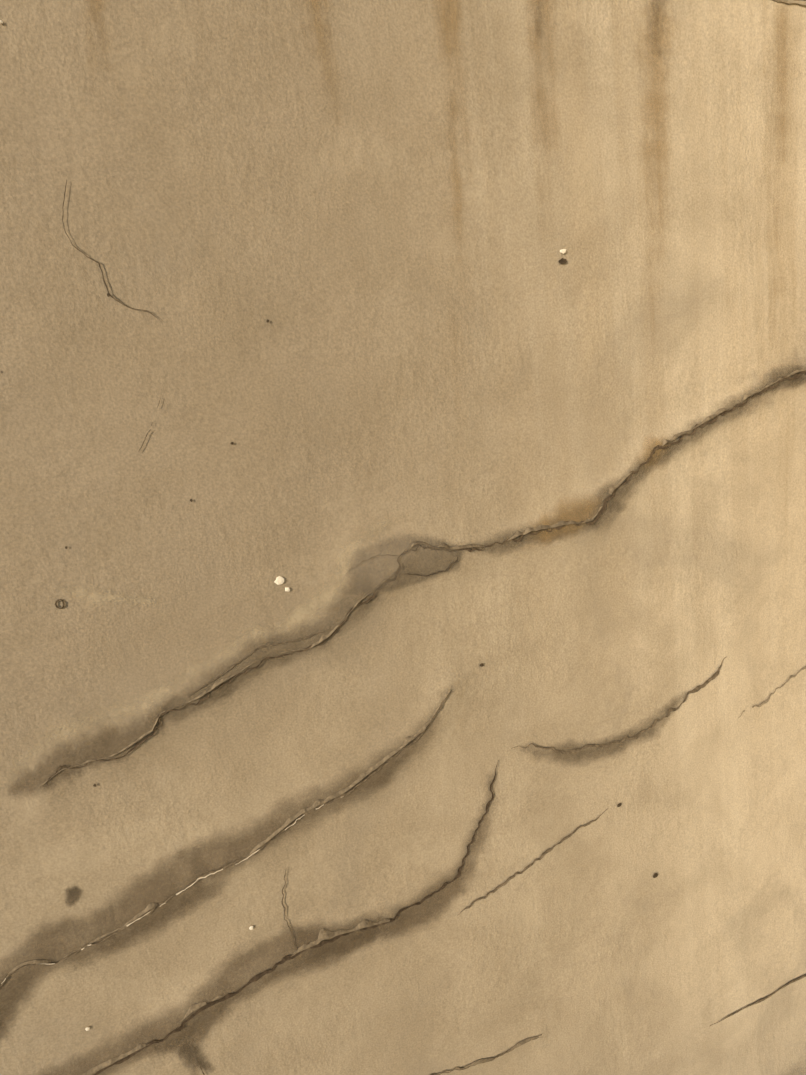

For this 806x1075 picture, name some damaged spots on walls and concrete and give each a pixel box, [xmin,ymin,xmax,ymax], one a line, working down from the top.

crack [62,179,159,319]
damp [0,798,316,1030]
damp [12,548,373,793]
crack [0,690,453,987]
damp [49,820,484,1075]
damp [334,749,407,801]
crack [80,657,726,1075]
crack [40,369,806,788]
damp [552,727,654,761]
crack [712,975,806,1025]